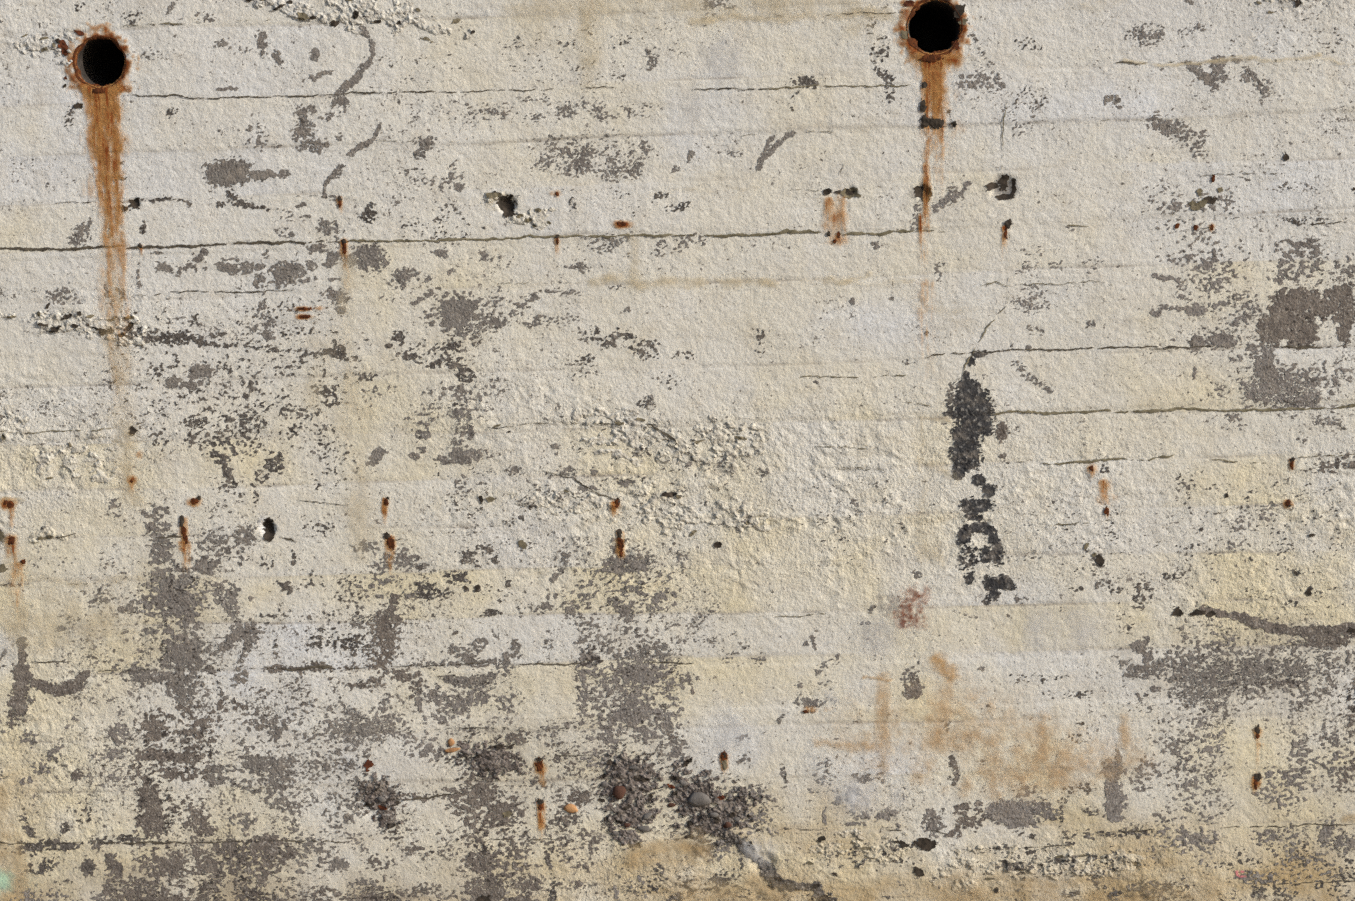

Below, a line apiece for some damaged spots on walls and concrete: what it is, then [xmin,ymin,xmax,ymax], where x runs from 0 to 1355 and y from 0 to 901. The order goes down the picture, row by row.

rust [65,24,142,285]
rust [825,198,844,244]
rust [894,0,970,243]
peeling [968,350,988,376]
peeling [1142,179,1355,430]
peeling [741,462,938,566]